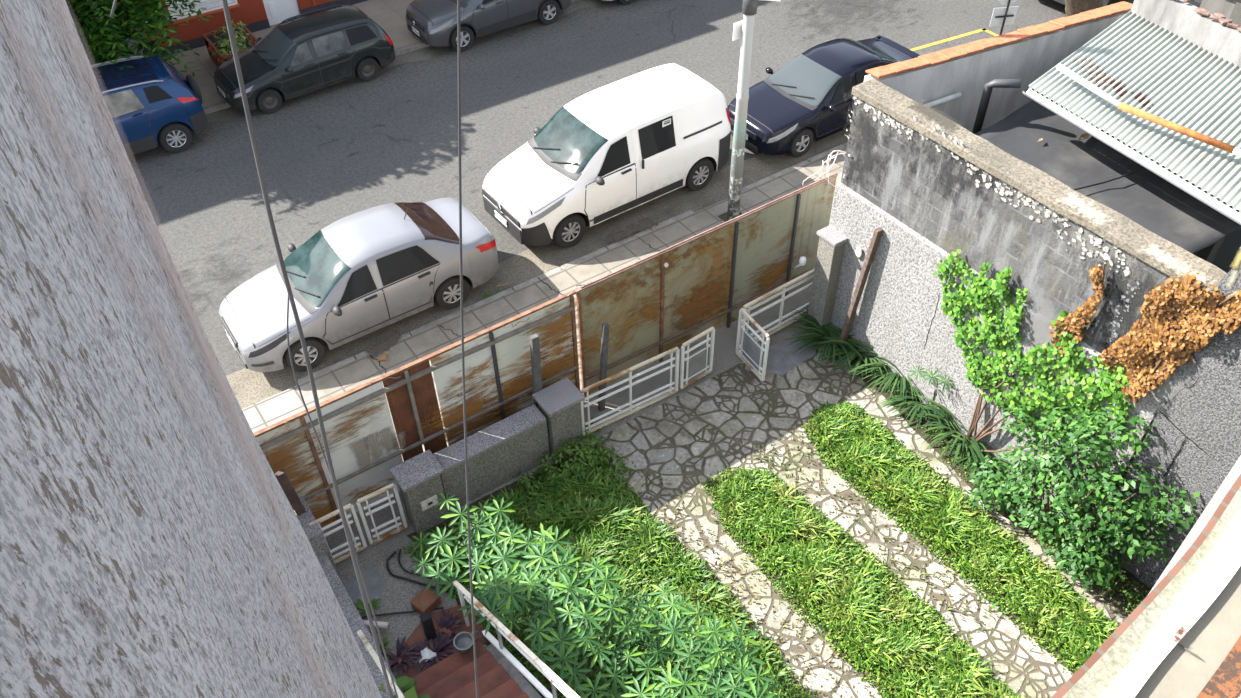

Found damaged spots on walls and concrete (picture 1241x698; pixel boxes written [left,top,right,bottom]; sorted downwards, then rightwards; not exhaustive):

corrosion [1073,58,1153,109]
water stain [845,94,1021,254]
water stain [1018,240,1152,349]
water stain [1150,366,1180,401]
corrosion [264,397,384,493]